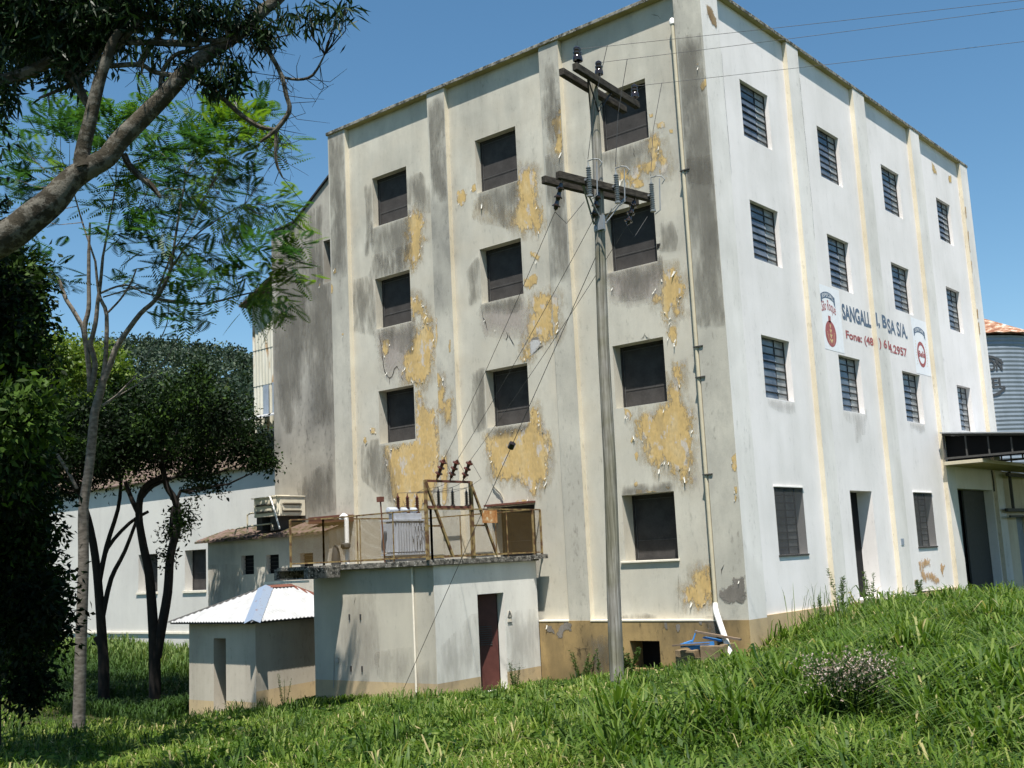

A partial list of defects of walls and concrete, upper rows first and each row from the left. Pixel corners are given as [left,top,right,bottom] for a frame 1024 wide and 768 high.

leakage [413,104,443,203]
peeling [456,165,544,235]
peeling [618,114,673,188]
leakage [683,45,720,315]
leakage [275,216,329,431]
peeling [484,252,560,362]
peeling [652,267,686,346]
peeling [383,294,452,509]
peeling [485,407,552,505]
peeling [624,362,693,484]
peeling [683,565,746,625]
peeling [915,559,945,584]